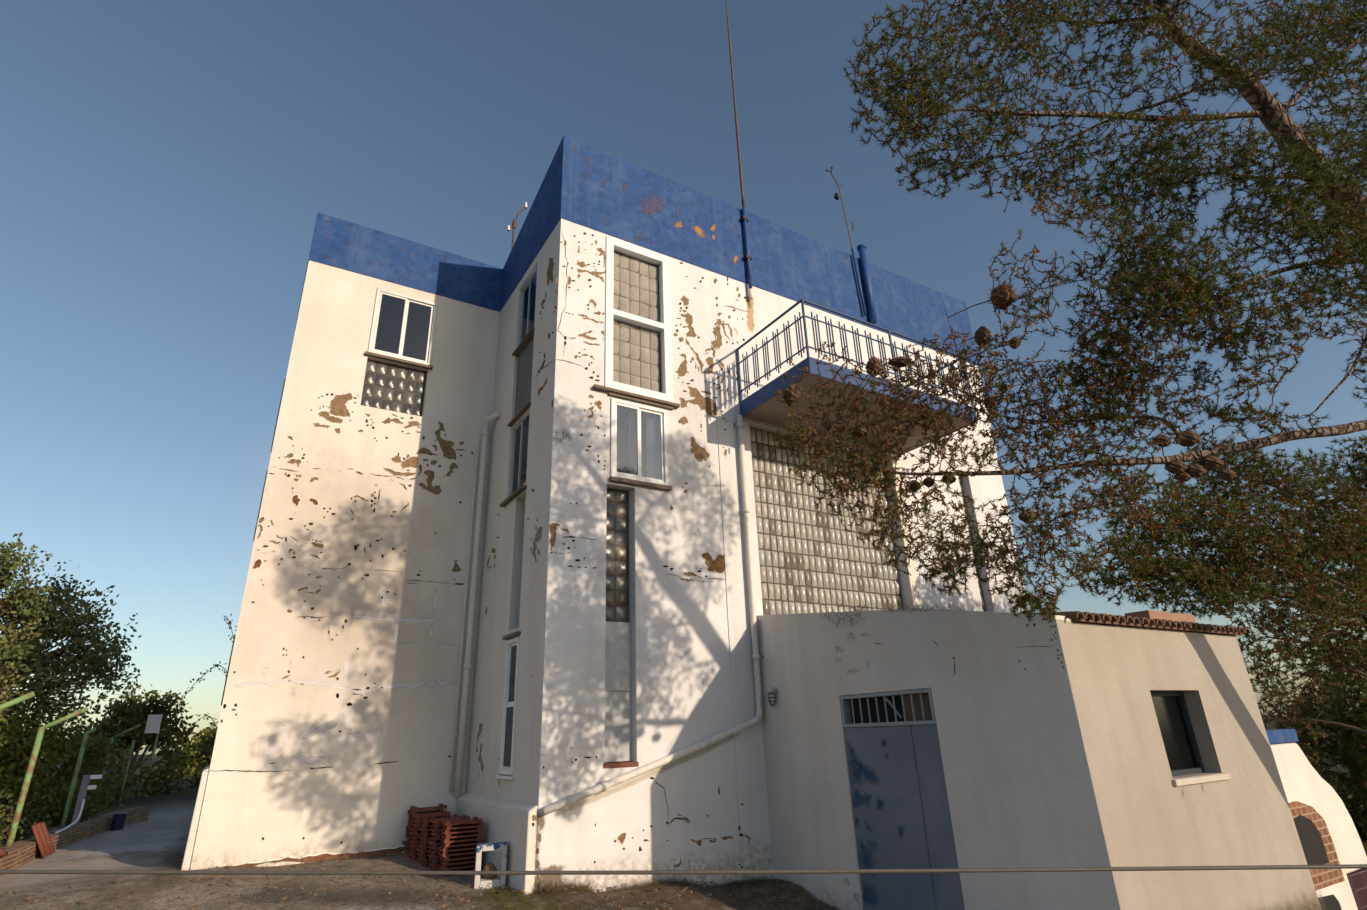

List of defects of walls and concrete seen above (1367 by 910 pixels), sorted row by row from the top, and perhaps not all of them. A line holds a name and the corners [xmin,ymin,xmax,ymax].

peeling [539,232,606,470]
peeling [674,256,754,467]
rust [746,289,754,330]
peeling [256,436,373,553]
peeling [311,392,473,496]
peeling [527,518,569,563]
peeling [662,551,725,583]
peeling [614,815,750,852]